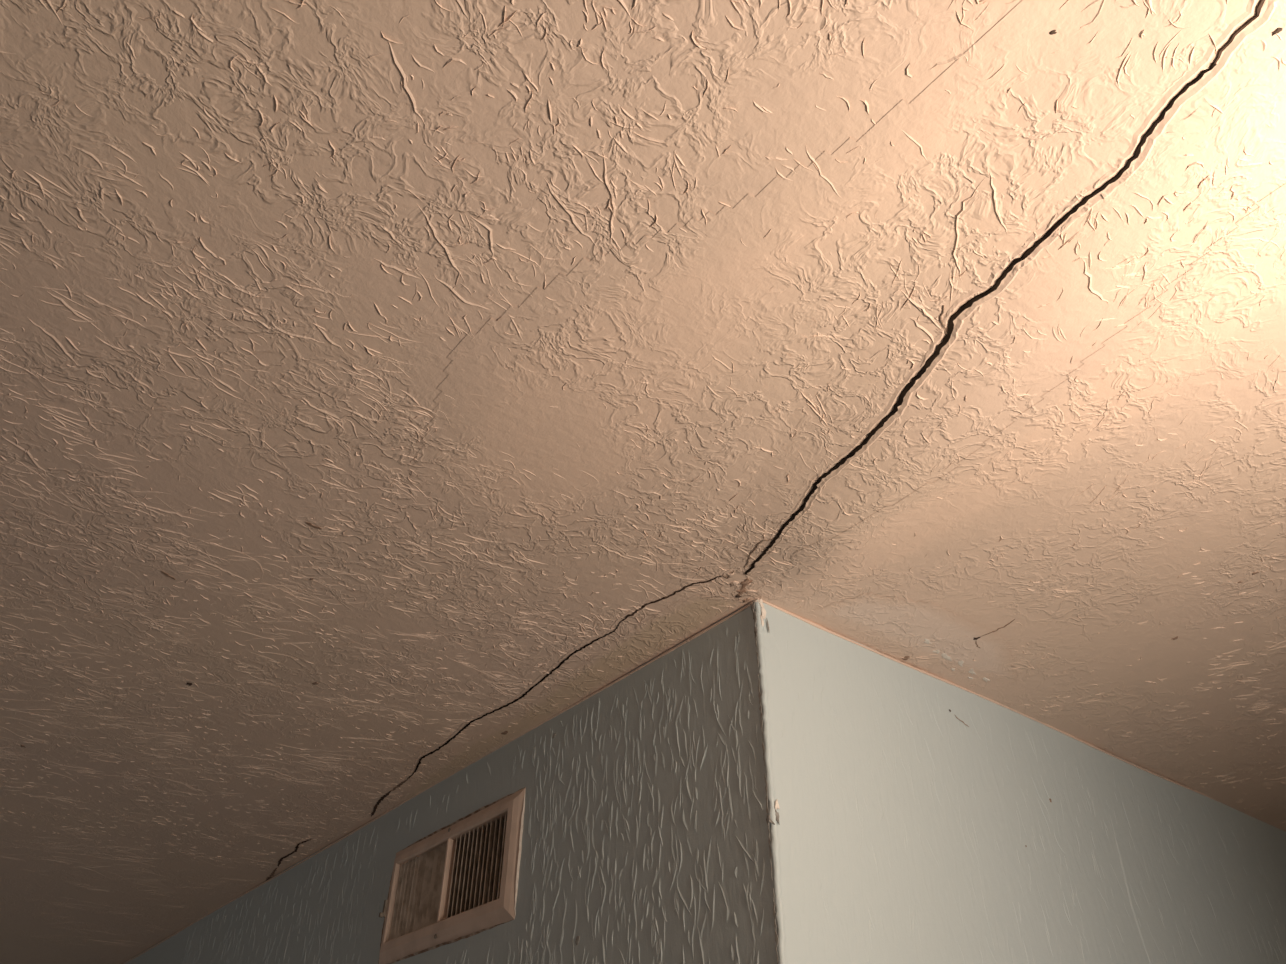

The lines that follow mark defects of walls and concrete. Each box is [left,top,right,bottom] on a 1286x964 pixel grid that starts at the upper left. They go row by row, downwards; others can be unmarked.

crack [266,839,311,881]
crack [371,0,1279,964]